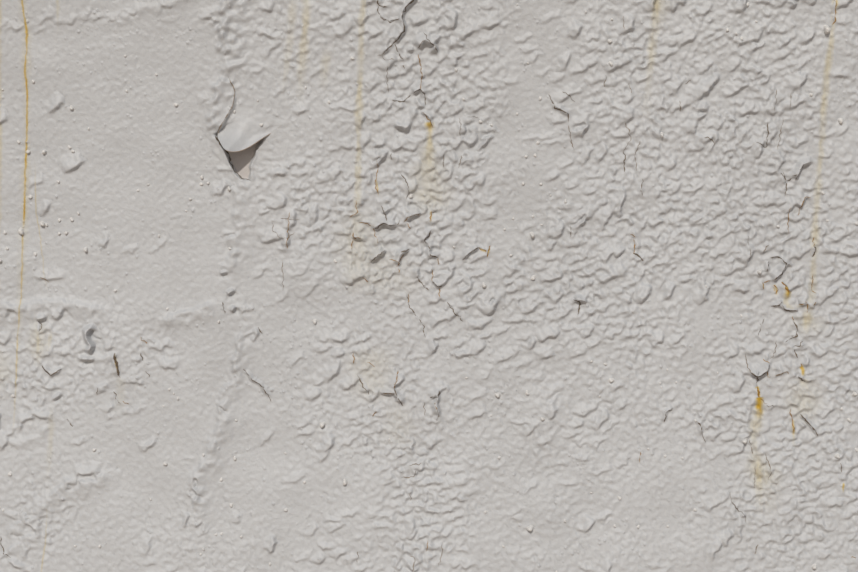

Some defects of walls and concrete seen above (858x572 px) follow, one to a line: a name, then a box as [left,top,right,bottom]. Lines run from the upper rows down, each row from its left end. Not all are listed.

crack [377,0,438,128]
peeling [215,78,282,180]
crack [350,155,464,338]
crack [460,245,490,260]
crack [779,164,811,231]
crack [745,236,821,436]